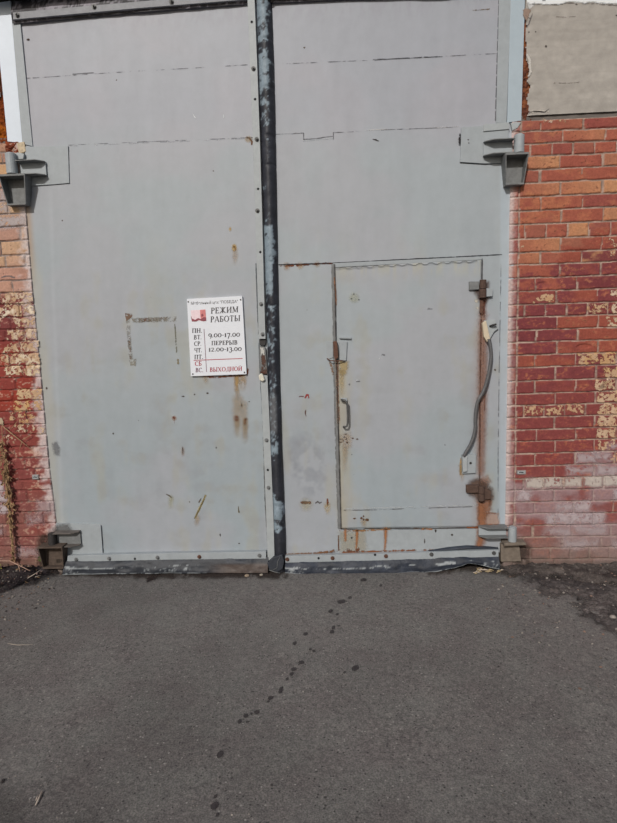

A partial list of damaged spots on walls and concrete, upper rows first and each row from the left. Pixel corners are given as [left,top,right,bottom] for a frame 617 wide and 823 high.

spalling [521,0,617,121]
spalling [0,69,19,153]
peeling [0,290,40,377]
peeling [587,290,617,327]
peeling [6,387,47,446]
corrosion [467,282,499,546]
peeling [523,403,584,417]
peeling [577,352,617,463]
corrosion [288,515,436,554]